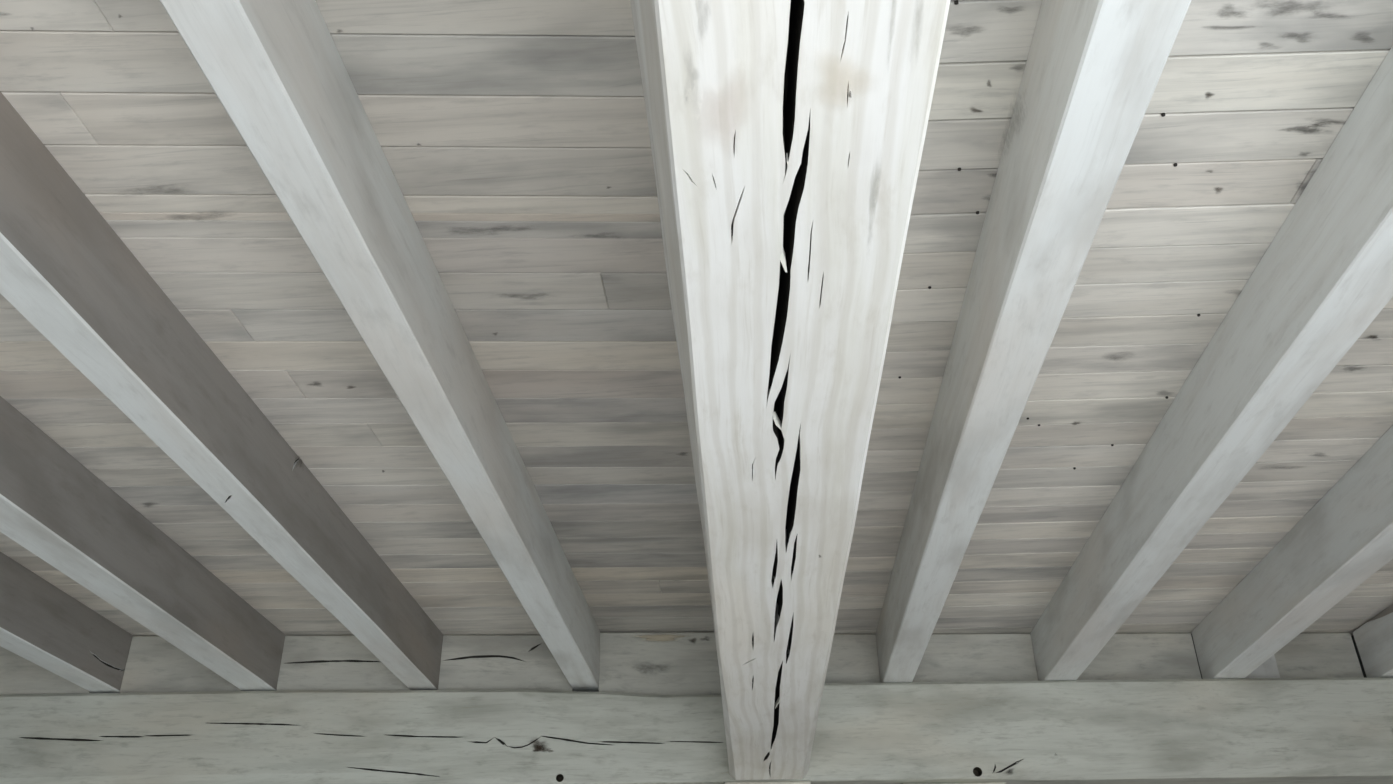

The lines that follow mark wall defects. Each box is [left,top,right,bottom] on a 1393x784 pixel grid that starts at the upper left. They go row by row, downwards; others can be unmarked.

crack [752,0,823,773]
crack [288,658,379,666]
crack [443,645,539,661]
crack [19,723,724,777]